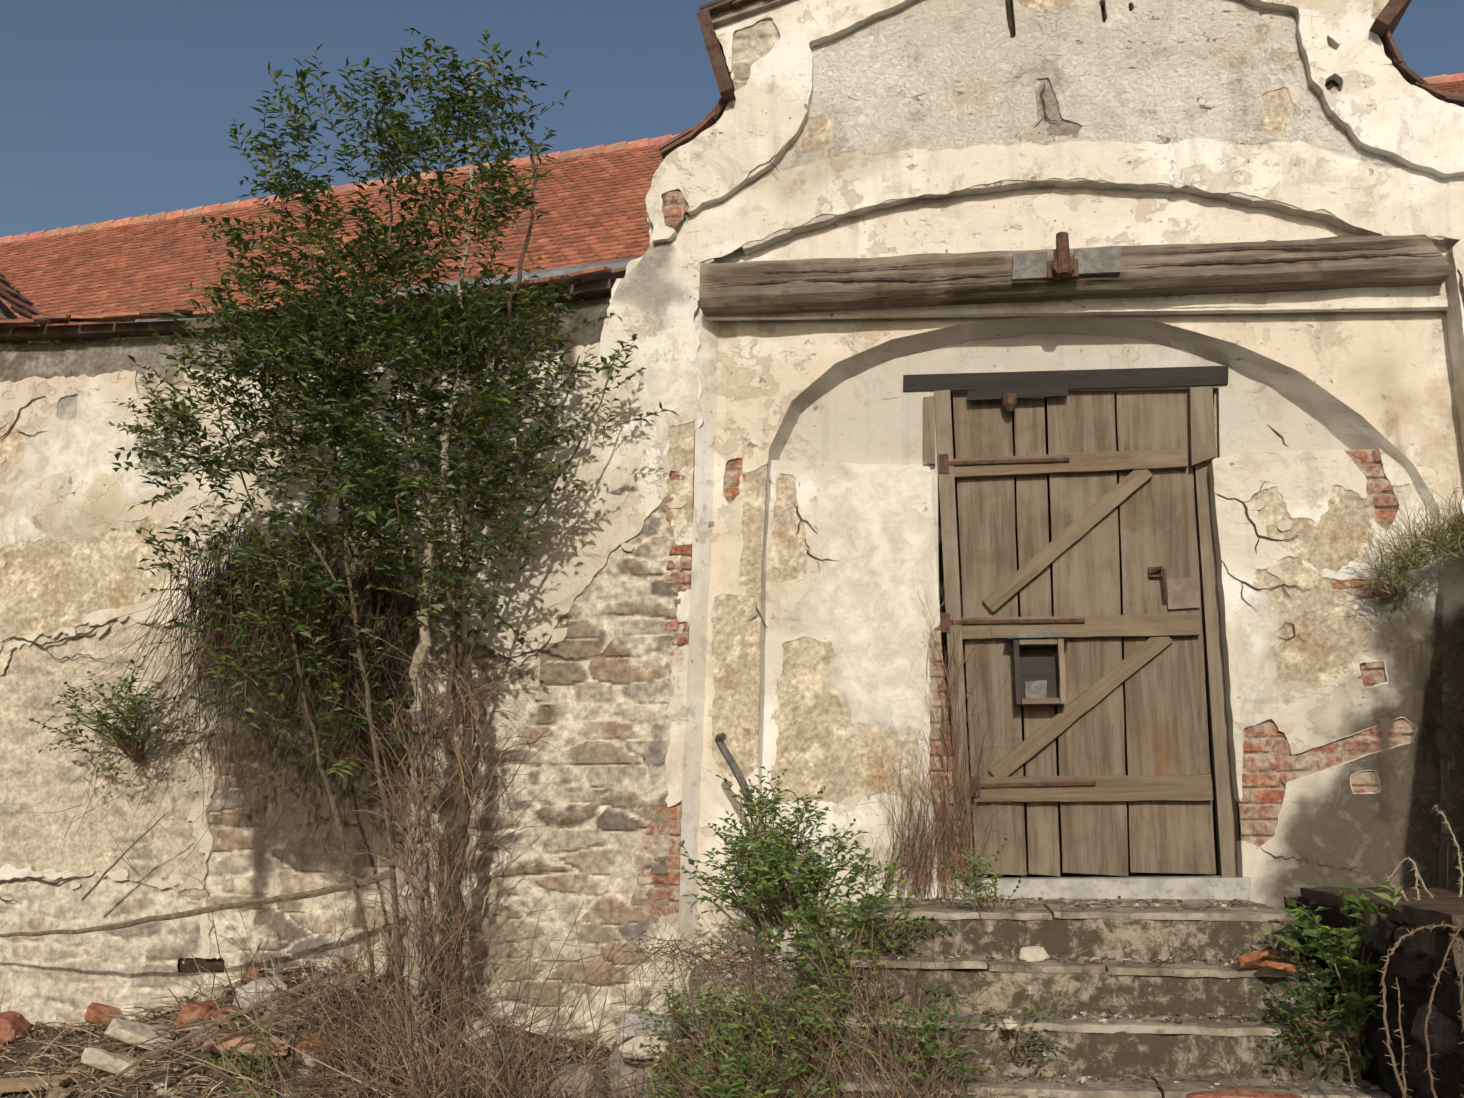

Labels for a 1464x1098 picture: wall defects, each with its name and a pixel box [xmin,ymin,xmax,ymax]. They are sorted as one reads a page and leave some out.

flaking render [730,20,780,90]
flaking render [662,190,690,231]
crack [1456,269,1464,304]
crack [794,504,834,572]
crack [1213,481,1309,642]
flaking render [1249,449,1399,688]
crack [0,617,118,661]
flaking render [0,421,695,1042]
flaking render [708,458,966,882]
flaking render [1238,718,1415,847]
leakage [1267,585,1464,911]
crack [0,876,84,902]